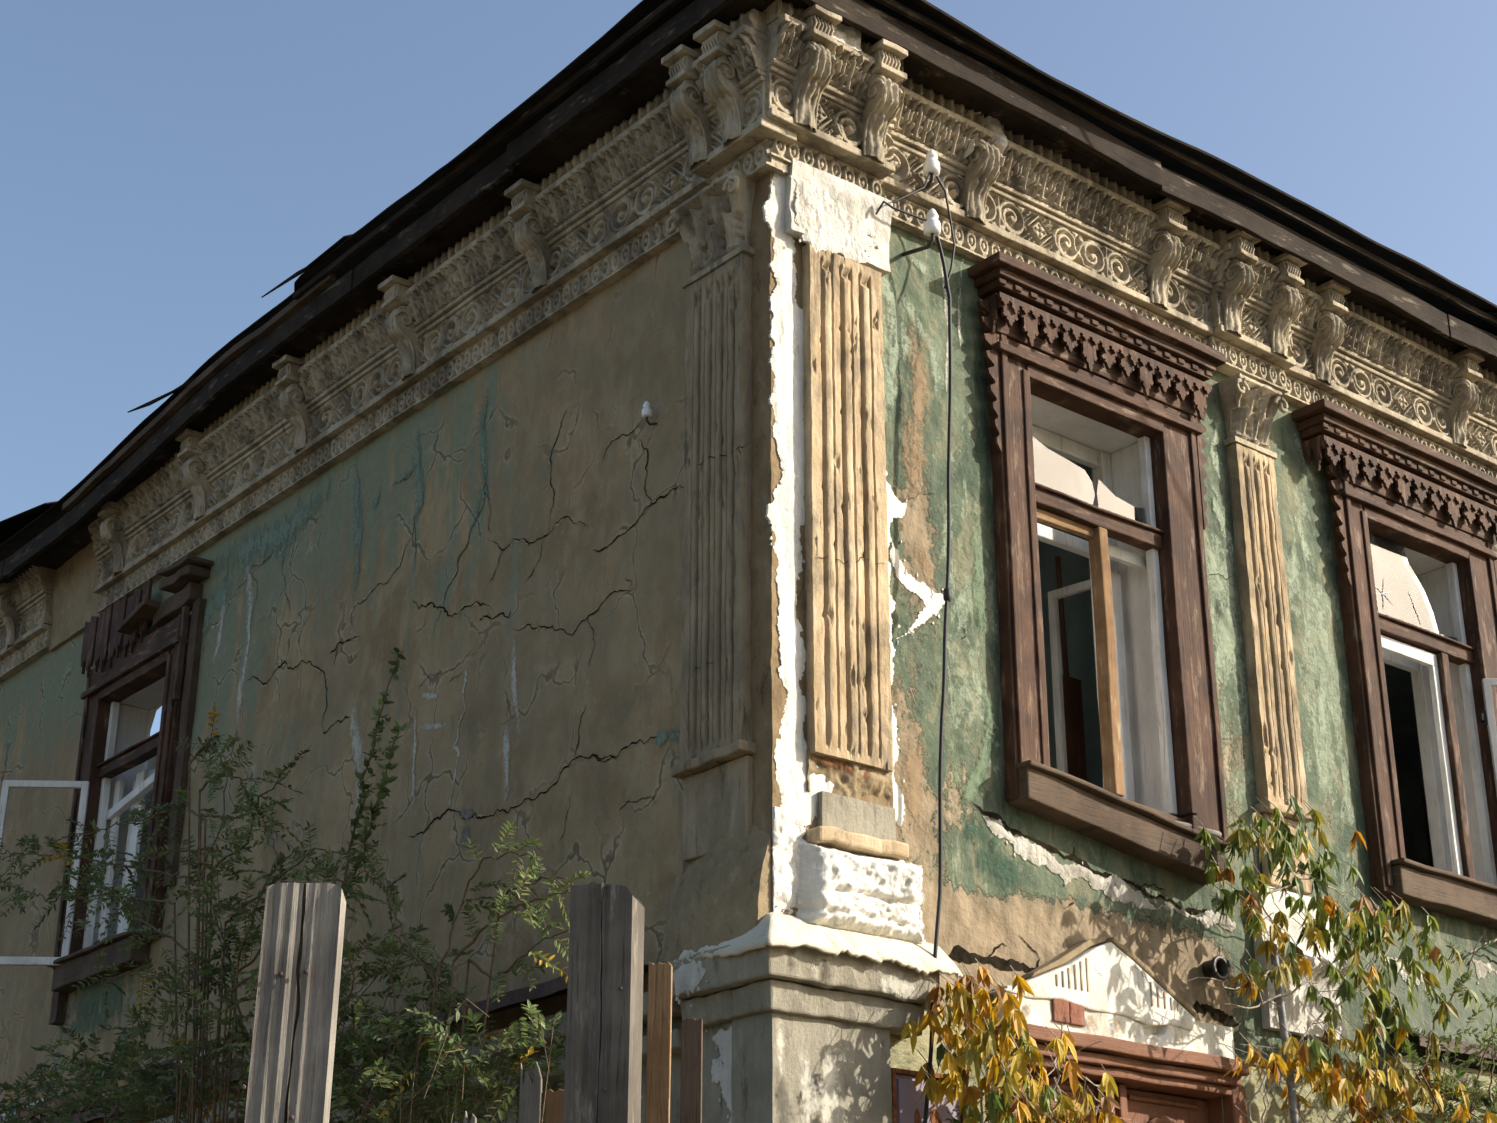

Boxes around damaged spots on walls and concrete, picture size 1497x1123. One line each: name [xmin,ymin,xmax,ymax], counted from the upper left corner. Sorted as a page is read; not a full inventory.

water stain [202,481,330,722]
crack [246,400,752,840]
flaking render [762,170,880,915]
flaking render [886,471,945,685]
water stain [350,710,362,818]
water stain [503,650,519,787]
flaking render [891,703,905,828]
flaking render [983,816,1236,932]
flaking render [1472,959,1497,985]